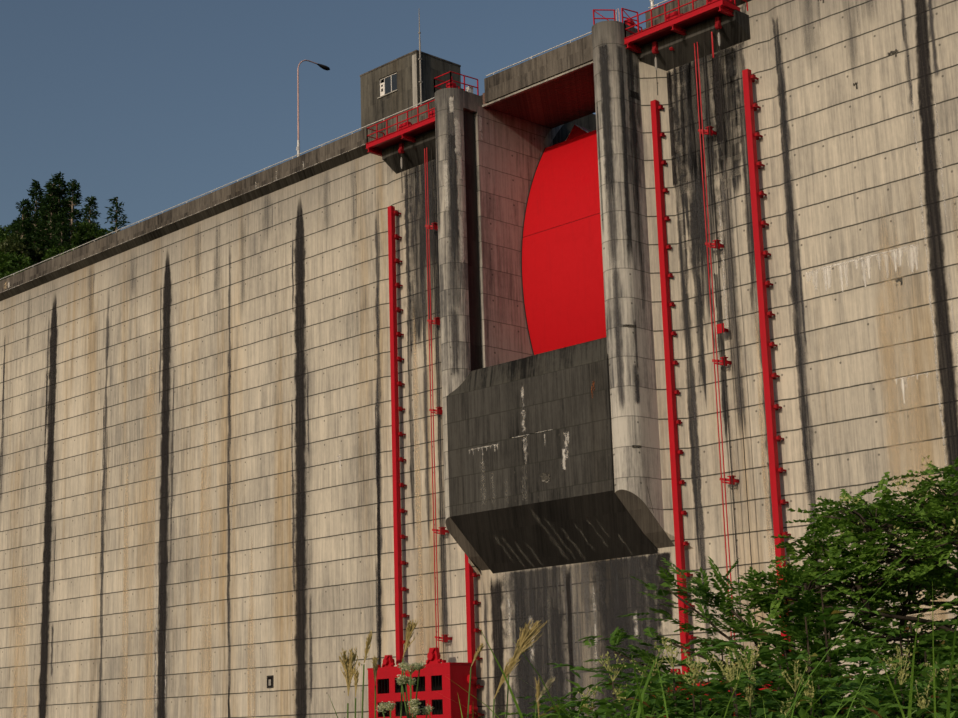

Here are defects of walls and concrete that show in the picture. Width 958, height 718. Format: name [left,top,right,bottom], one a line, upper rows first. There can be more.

leakage [39,300,58,718]
leakage [154,258,174,718]
leakage [291,203,312,718]
leakage [404,106,459,634]
leakage [666,43,756,611]
leakage [772,0,958,539]